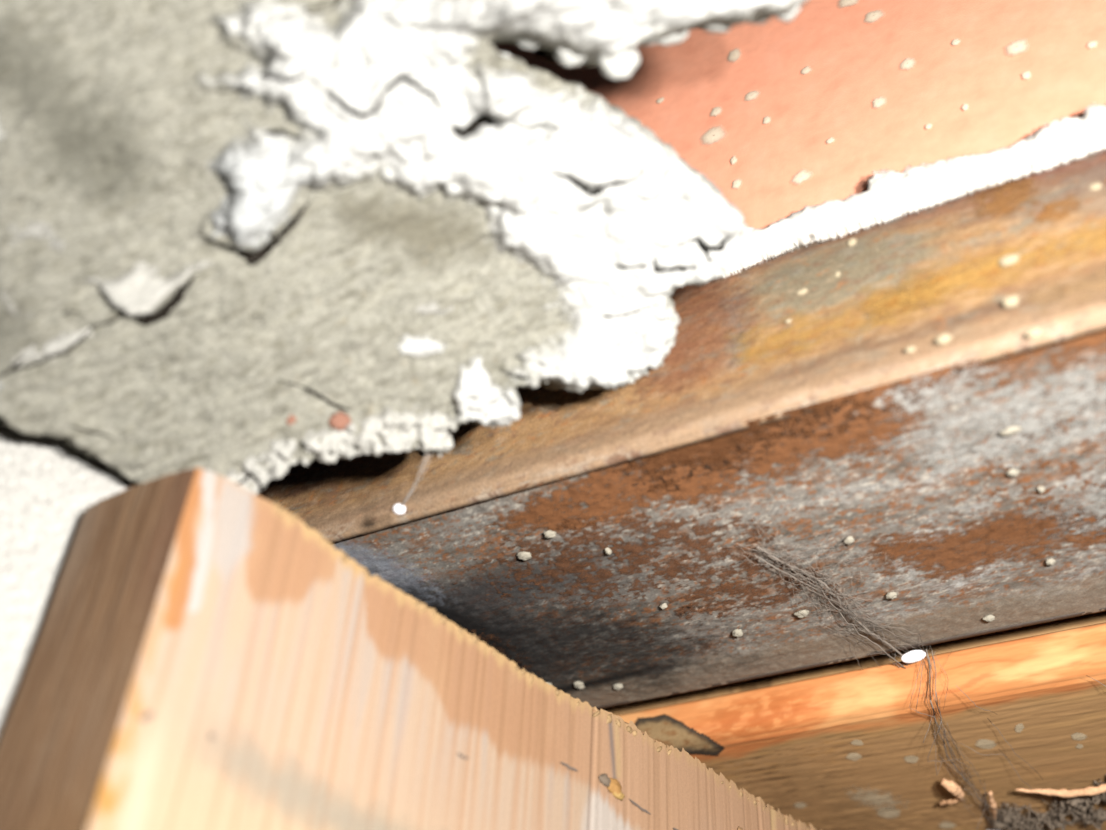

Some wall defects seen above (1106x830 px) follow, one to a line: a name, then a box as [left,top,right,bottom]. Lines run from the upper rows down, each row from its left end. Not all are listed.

corrosion [978,179,1032,213]
spalling [328,411,351,431]
corrosion [468,331,1106,624]
water stain [428,603,703,680]